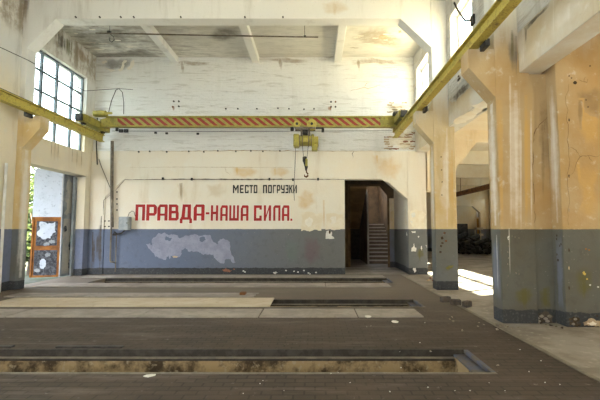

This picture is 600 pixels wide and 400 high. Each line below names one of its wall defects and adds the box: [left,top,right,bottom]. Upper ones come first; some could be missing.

water stain [57,26,164,68]
spalling [382,130,416,151]
crack [565,78,600,225]
peeling [301,212,344,239]
peeling [105,233,394,283]